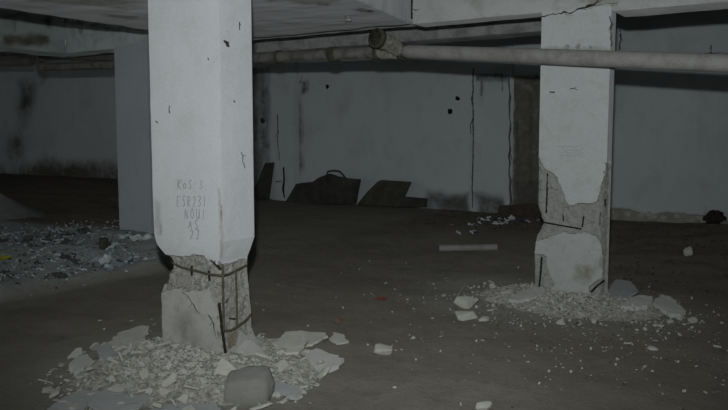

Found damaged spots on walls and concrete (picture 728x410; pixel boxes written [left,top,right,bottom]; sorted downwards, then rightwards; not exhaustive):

crack [541,0,623,50]
crack [468,68,476,208]
spalling [535,159,706,296]
spalling [162,254,253,354]